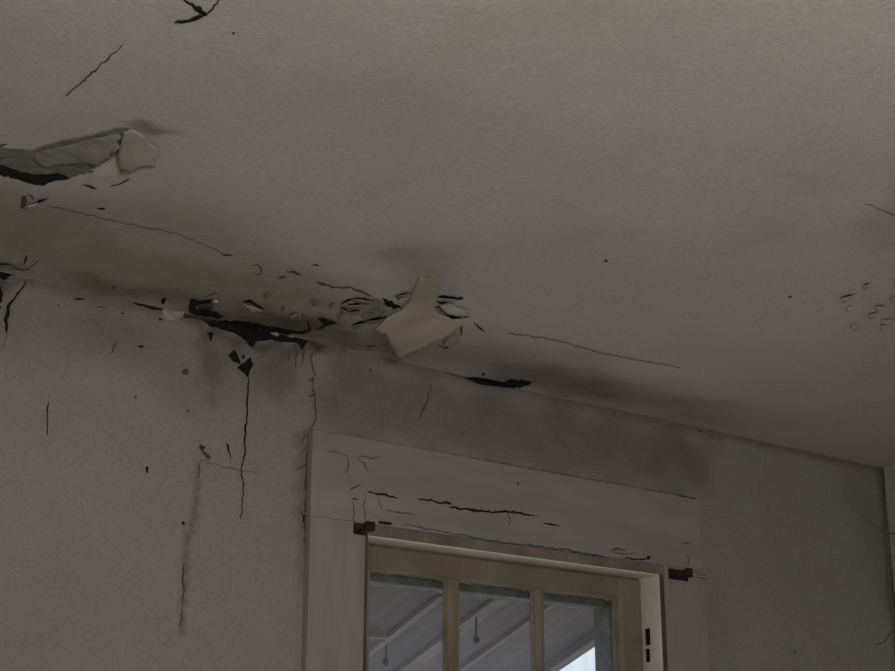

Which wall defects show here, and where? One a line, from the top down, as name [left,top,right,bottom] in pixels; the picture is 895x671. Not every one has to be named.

crack [174,0,219,24]
crack [66,44,123,96]
peeling [0,128,158,209]
crack [0,281,26,351]
leakage [0,255,37,309]
flaking render [134,293,224,321]
leakage [183,313,336,377]
peeling [311,281,411,328]
peeling [435,295,469,349]
leakage [444,371,532,389]
crack [201,377,256,518]
crack [368,491,650,560]